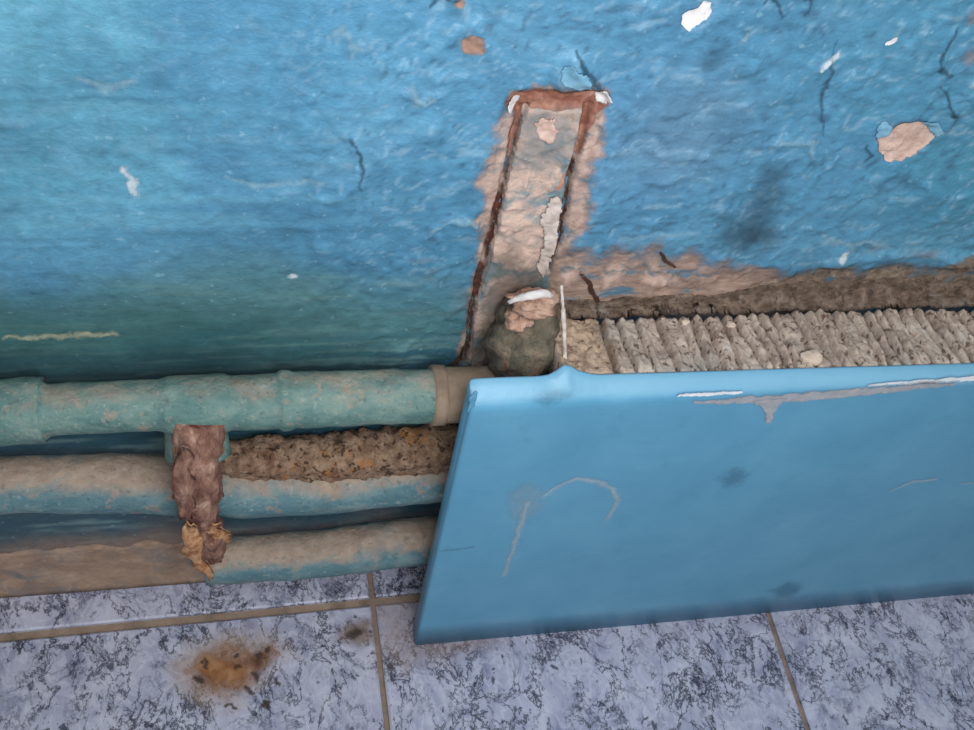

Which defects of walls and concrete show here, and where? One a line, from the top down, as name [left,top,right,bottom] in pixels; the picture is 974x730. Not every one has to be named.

peeling [462,36,485,55]
spalling [681,1,712,31]
crack [940,32,959,125]
corrosion [505,89,609,159]
peeling [458,66,974,366]
peeling [677,376,974,423]
corrosion [170,445,232,582]
corrosion [193,646,274,695]